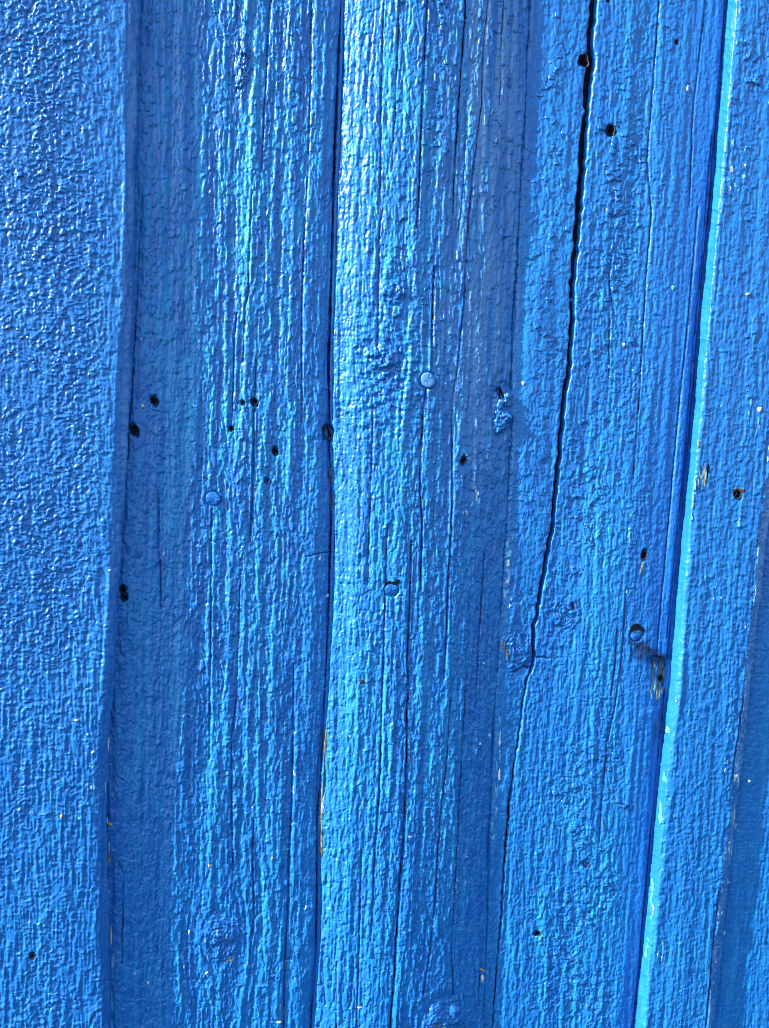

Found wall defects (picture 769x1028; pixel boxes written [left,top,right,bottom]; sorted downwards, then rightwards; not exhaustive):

crack [377,0,400,346]
crack [417,0,428,220]
crack [335,388,426,1028]
crack [423,0,504,995]
crack [479,0,594,1027]